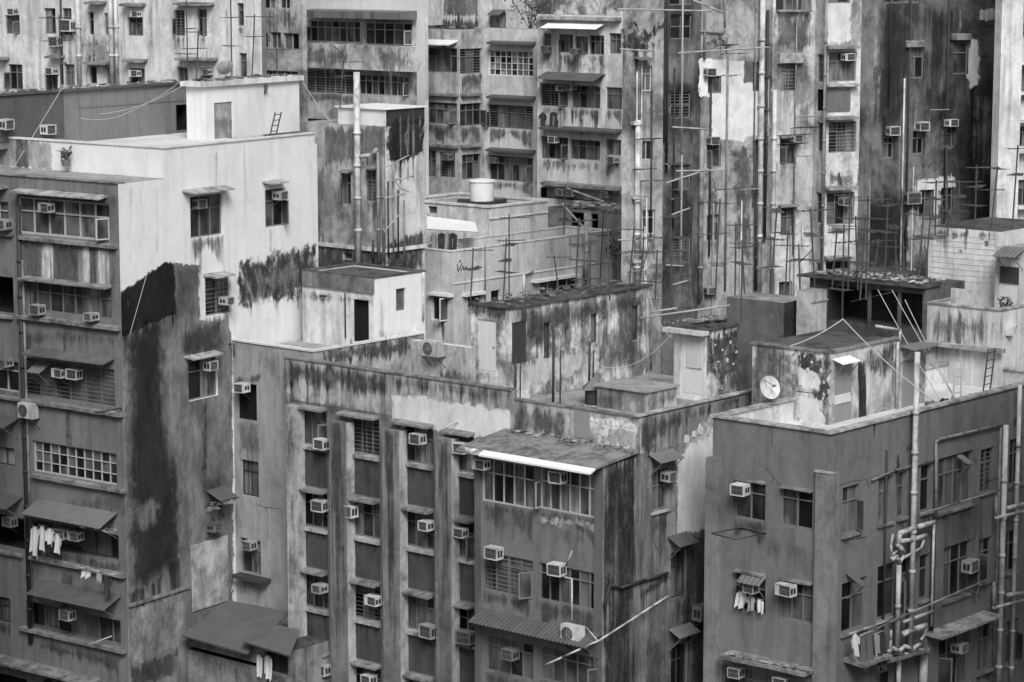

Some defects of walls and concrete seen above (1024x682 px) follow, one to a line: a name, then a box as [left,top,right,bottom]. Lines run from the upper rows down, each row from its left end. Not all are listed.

peeling [698,58,811,143]
water stain [879,4,953,136]
peeling [966,39,980,88]
water stain [194,238,220,256]
water stain [238,116,532,308]
water stain [284,334,429,405]
water stain [440,371,496,399]
peeling [794,350,834,424]
water stain [23,243,197,610]
peeling [590,401,640,449]